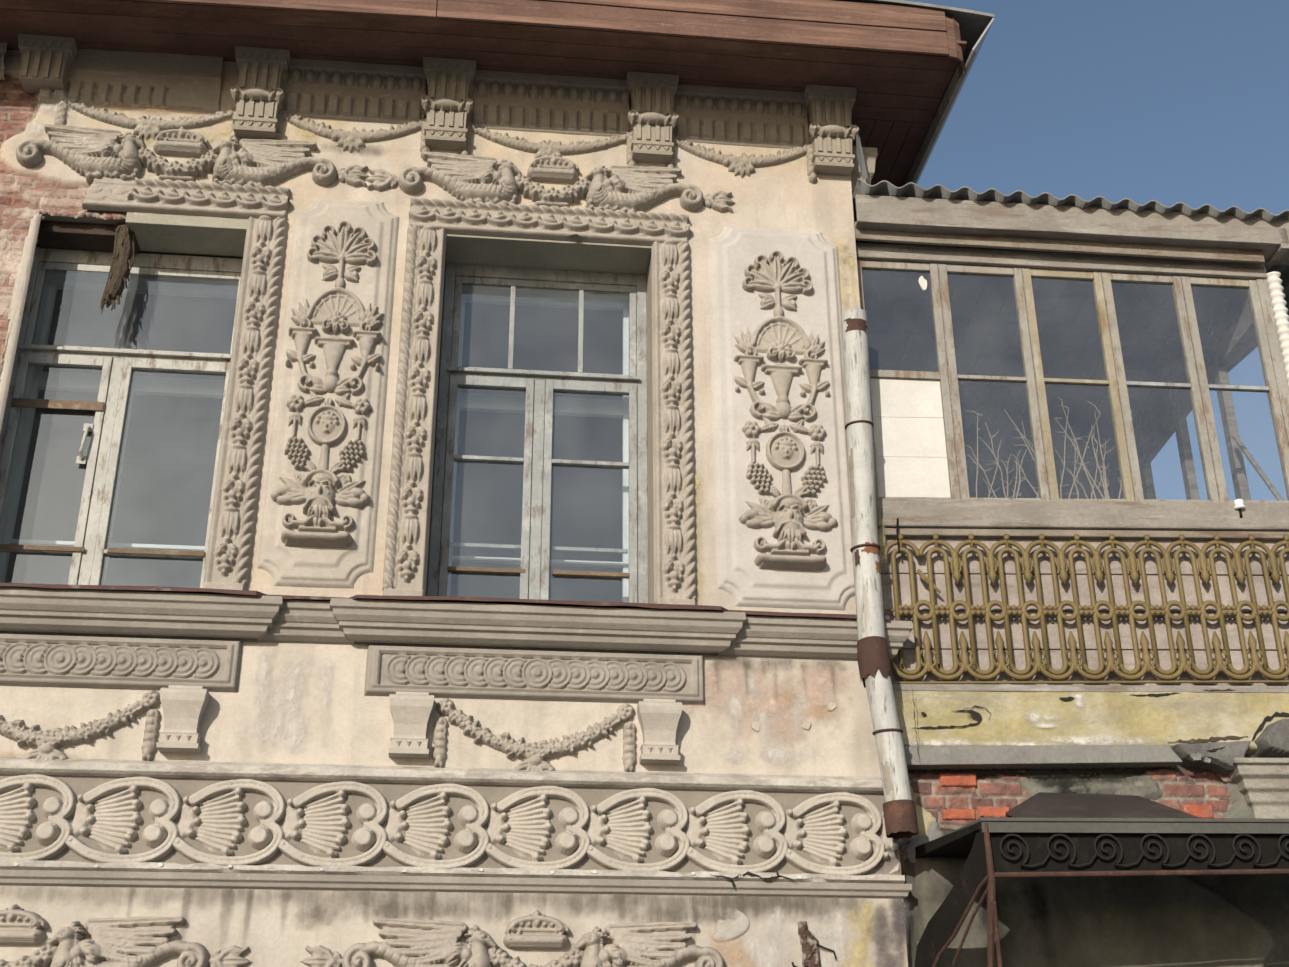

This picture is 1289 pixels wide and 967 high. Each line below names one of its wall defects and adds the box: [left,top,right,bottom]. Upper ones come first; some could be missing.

flaking render [0,75,58,148]
flaking render [0,164,127,373]
crack [908,690,1289,778]
flaking render [908,771,1039,830]
flaking render [1145,752,1234,818]
flaking render [899,836,916,876]